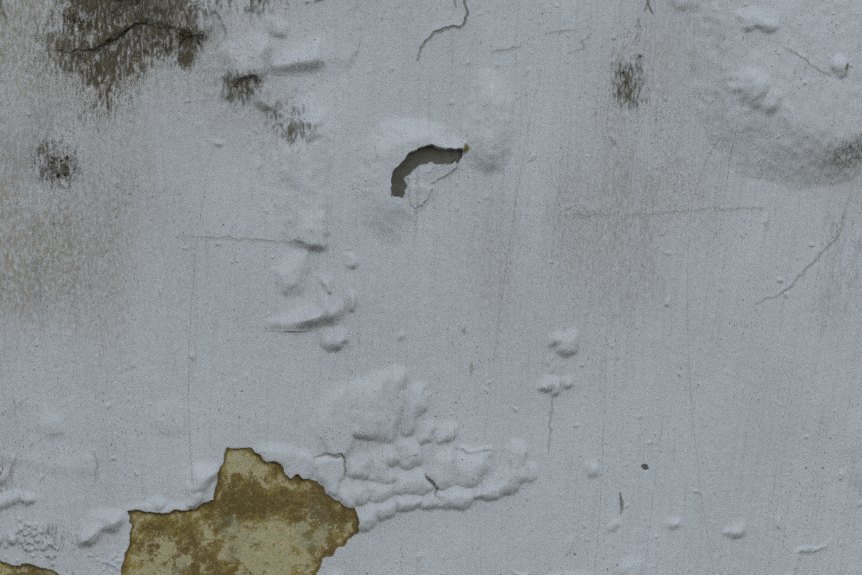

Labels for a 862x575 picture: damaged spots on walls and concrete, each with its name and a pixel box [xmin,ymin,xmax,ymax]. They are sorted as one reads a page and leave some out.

crack [56,23,208,57]
crack [416,0,469,61]
peeling [75,444,359,575]
peeling [0,561,59,575]